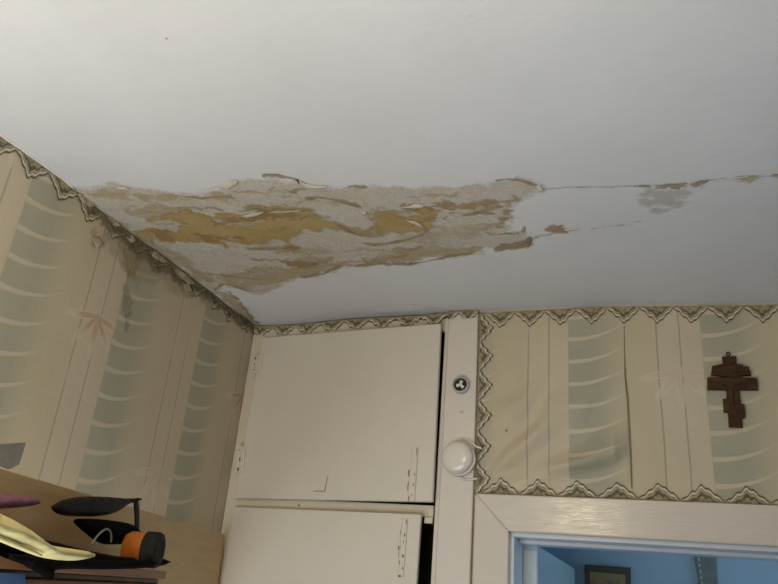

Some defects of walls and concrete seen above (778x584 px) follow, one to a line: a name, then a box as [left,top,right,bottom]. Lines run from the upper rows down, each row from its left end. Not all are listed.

crack [544,174,778,190]